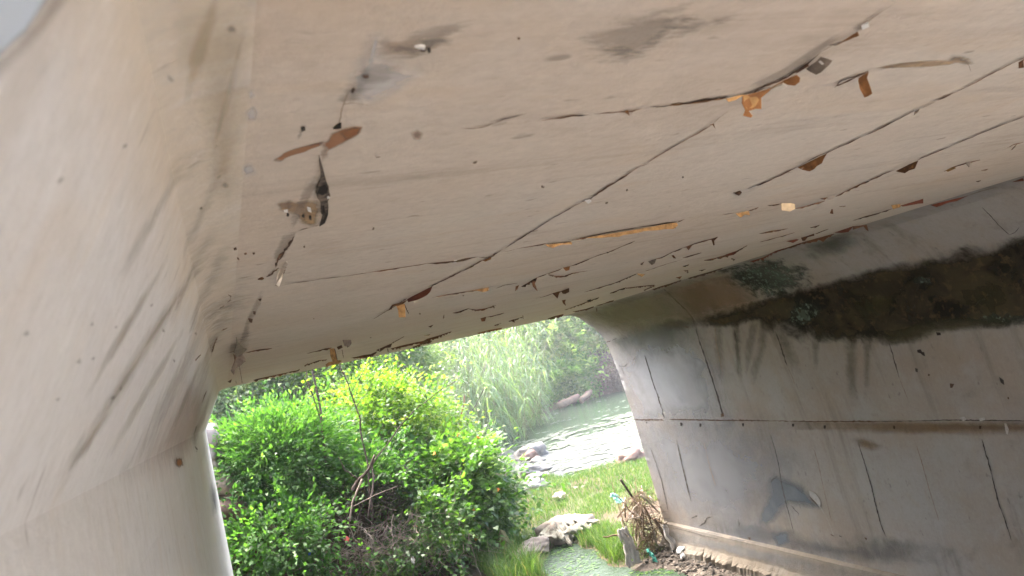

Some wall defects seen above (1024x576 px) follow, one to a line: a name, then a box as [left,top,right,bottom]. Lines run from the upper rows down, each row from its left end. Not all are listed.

crack [860,4,893,30]
peeling [726,32,859,118]
crack [754,45,832,92]
peeling [834,71,872,98]
crack [826,58,1023,154]
peeling [279,156,330,227]
peeling [583,219,684,238]
crack [258,92,1024,541]
leakage [655,432,895,567]